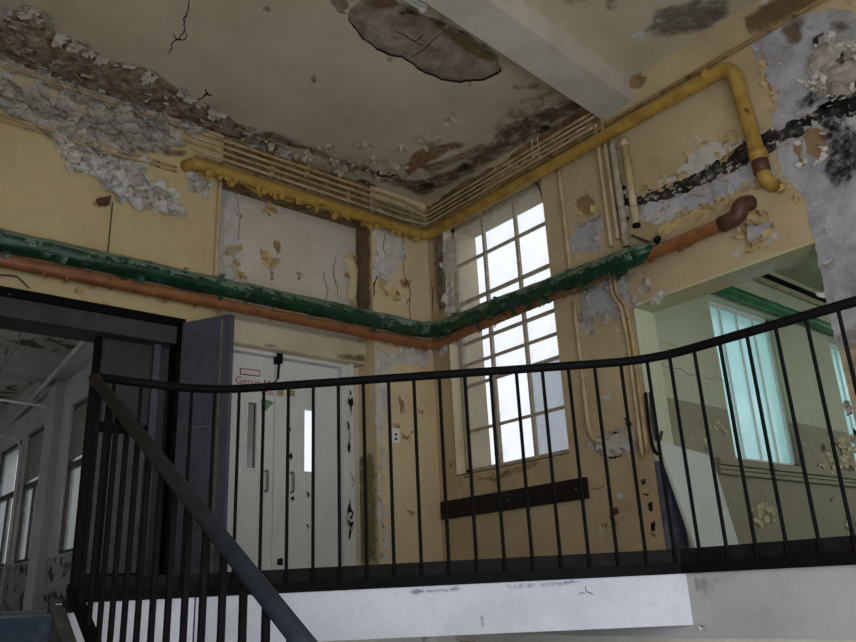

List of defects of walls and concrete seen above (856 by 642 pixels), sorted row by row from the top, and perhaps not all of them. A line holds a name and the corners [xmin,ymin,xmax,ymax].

crack [169,0,190,52]
leakage [651,0,727,35]
spalling [0,5,417,285]
leakage [262,132,315,153]
leakage [342,103,581,226]
spalling [608,129,762,239]
spalling [751,8,856,348]
mould [820,81,856,185]
peeling [332,211,421,301]
spalling [509,191,666,335]
peeling [365,307,497,560]
peeling [587,415,638,460]